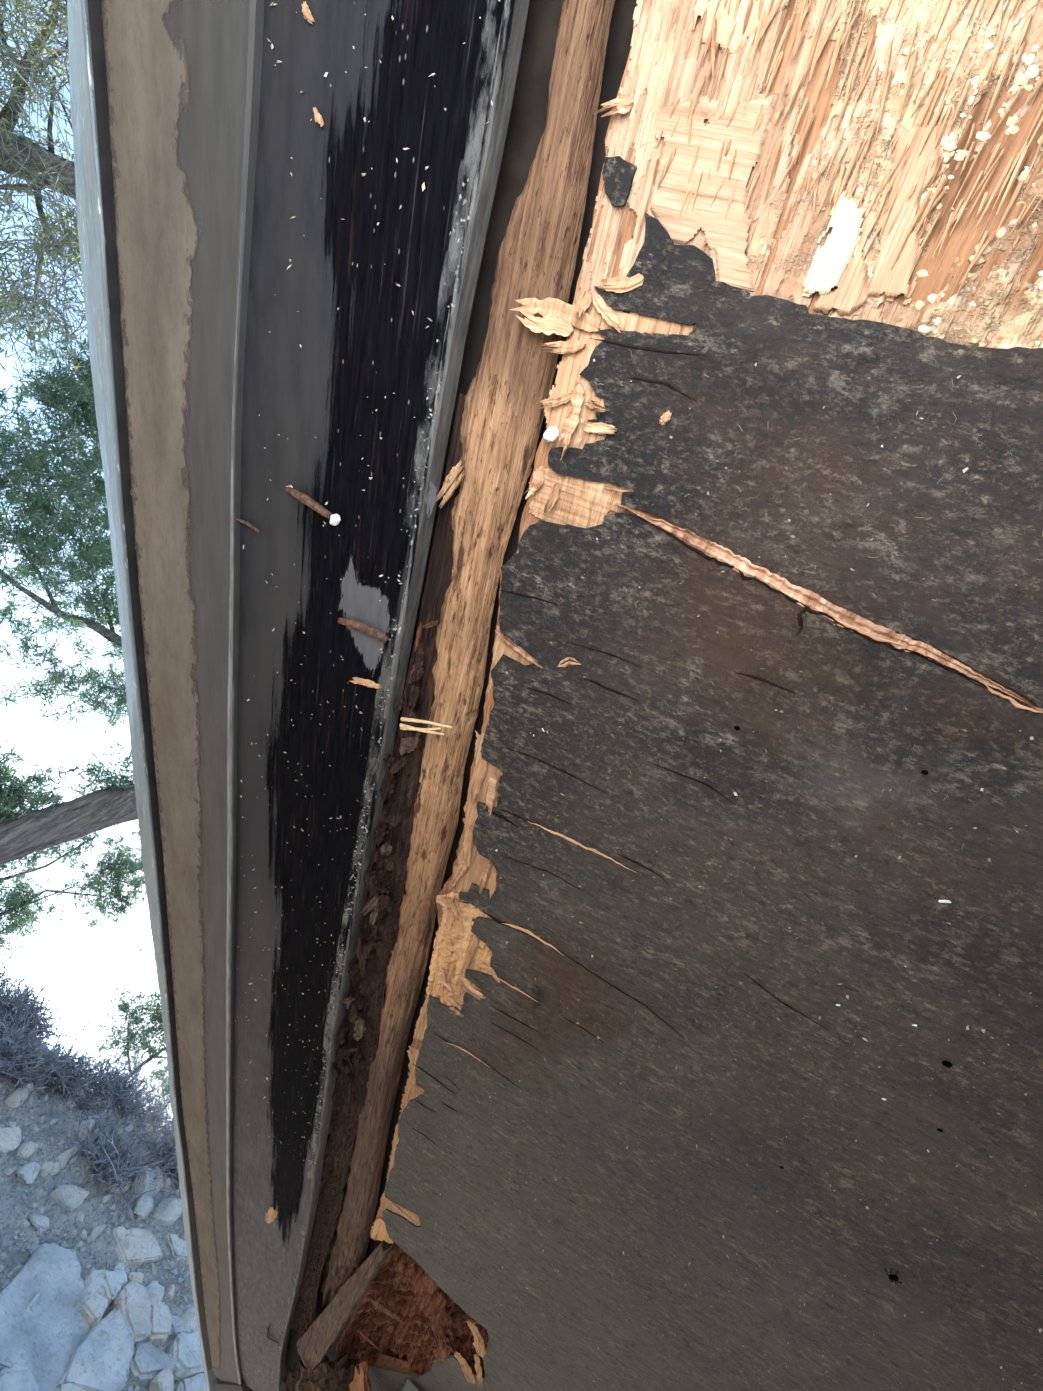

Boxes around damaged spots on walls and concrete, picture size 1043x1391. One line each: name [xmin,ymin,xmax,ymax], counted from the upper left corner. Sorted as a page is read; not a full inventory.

peeling [483,0,495,64]
peeling [438,91,488,313]
peeling [510,0,1043,528]
peeling [408,426,437,519]
peeling [487,625,539,693]
crack [615,503,1043,713]
peeling [278,557,424,1350]
peeling [370,731,503,1244]
peeling [408,1259,486,1388]